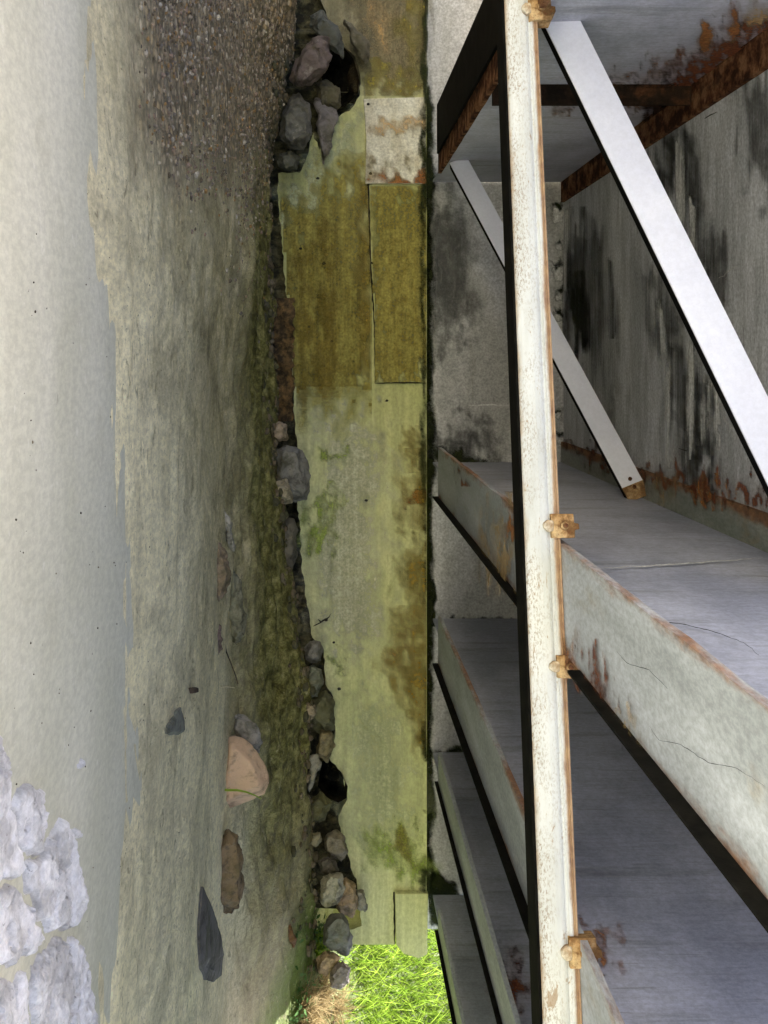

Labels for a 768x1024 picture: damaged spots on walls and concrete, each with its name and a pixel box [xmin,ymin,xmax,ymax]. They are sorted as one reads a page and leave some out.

corrosion [644,2,768,88]
corrosion [366,159,425,183]
damp [655,128,726,305]
damp [736,69,768,182]
damp [563,206,616,385]
damp [646,277,724,491]
corrosion [565,439,610,474]
corrosion [638,457,768,511]